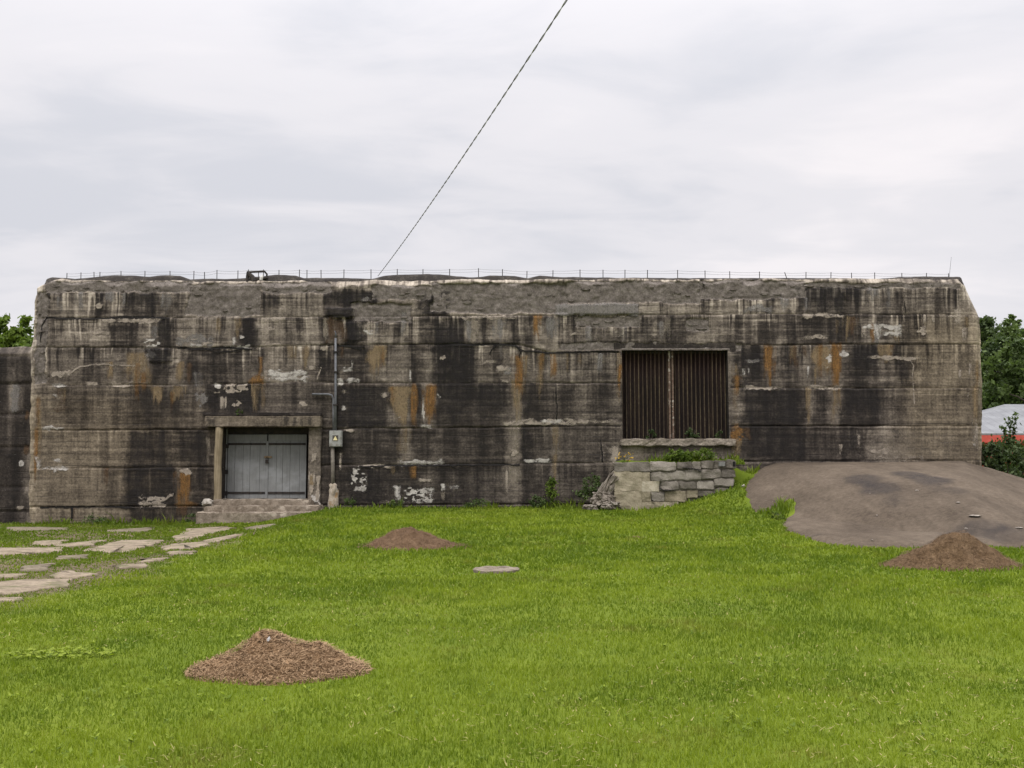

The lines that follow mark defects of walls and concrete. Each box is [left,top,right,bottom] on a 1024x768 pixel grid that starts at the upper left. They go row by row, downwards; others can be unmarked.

damp [803,287,890,319]
damp [51,363,134,395]
damp [78,292,171,363]
damp [195,383,255,412]
damp [268,366,322,382]
damp [337,367,379,432]
rust [389,385,436,442]
rust [790,316,899,419]
damp [825,324,916,368]
damp [339,453,390,491]
damp [393,478,458,503]
damp [504,418,614,492]